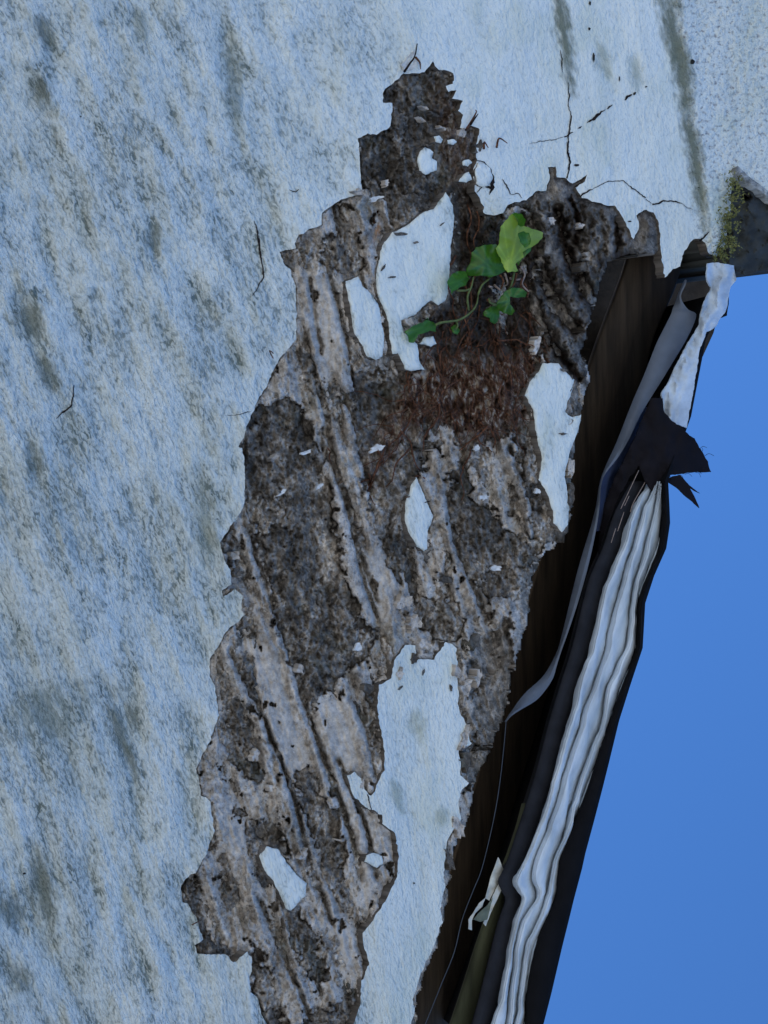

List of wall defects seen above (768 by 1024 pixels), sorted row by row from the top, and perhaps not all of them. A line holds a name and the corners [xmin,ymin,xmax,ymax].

damp [556,0,575,93]
crack [536,50,691,209]
damp [661,0,708,210]
crack [252,221,264,296]
spalling [181,43,658,1024]